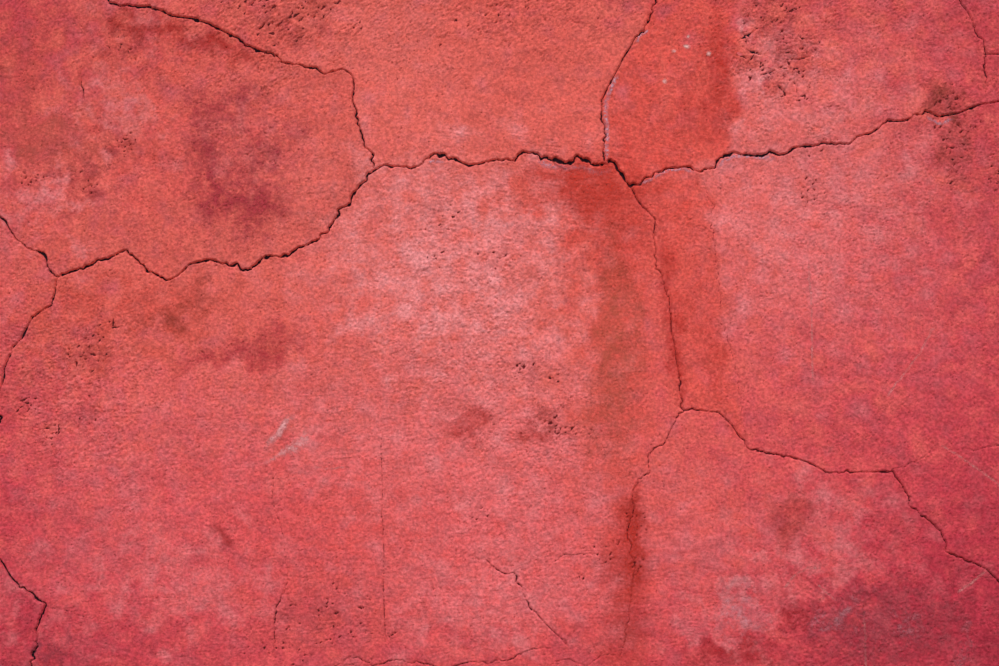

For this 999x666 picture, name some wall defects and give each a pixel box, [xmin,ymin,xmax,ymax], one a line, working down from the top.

crack [959,0,999,82]
crack [0,217,168,383]
crack [108,0,991,546]
crack [880,471,999,582]
crack [0,559,84,666]
crack [488,561,608,662]